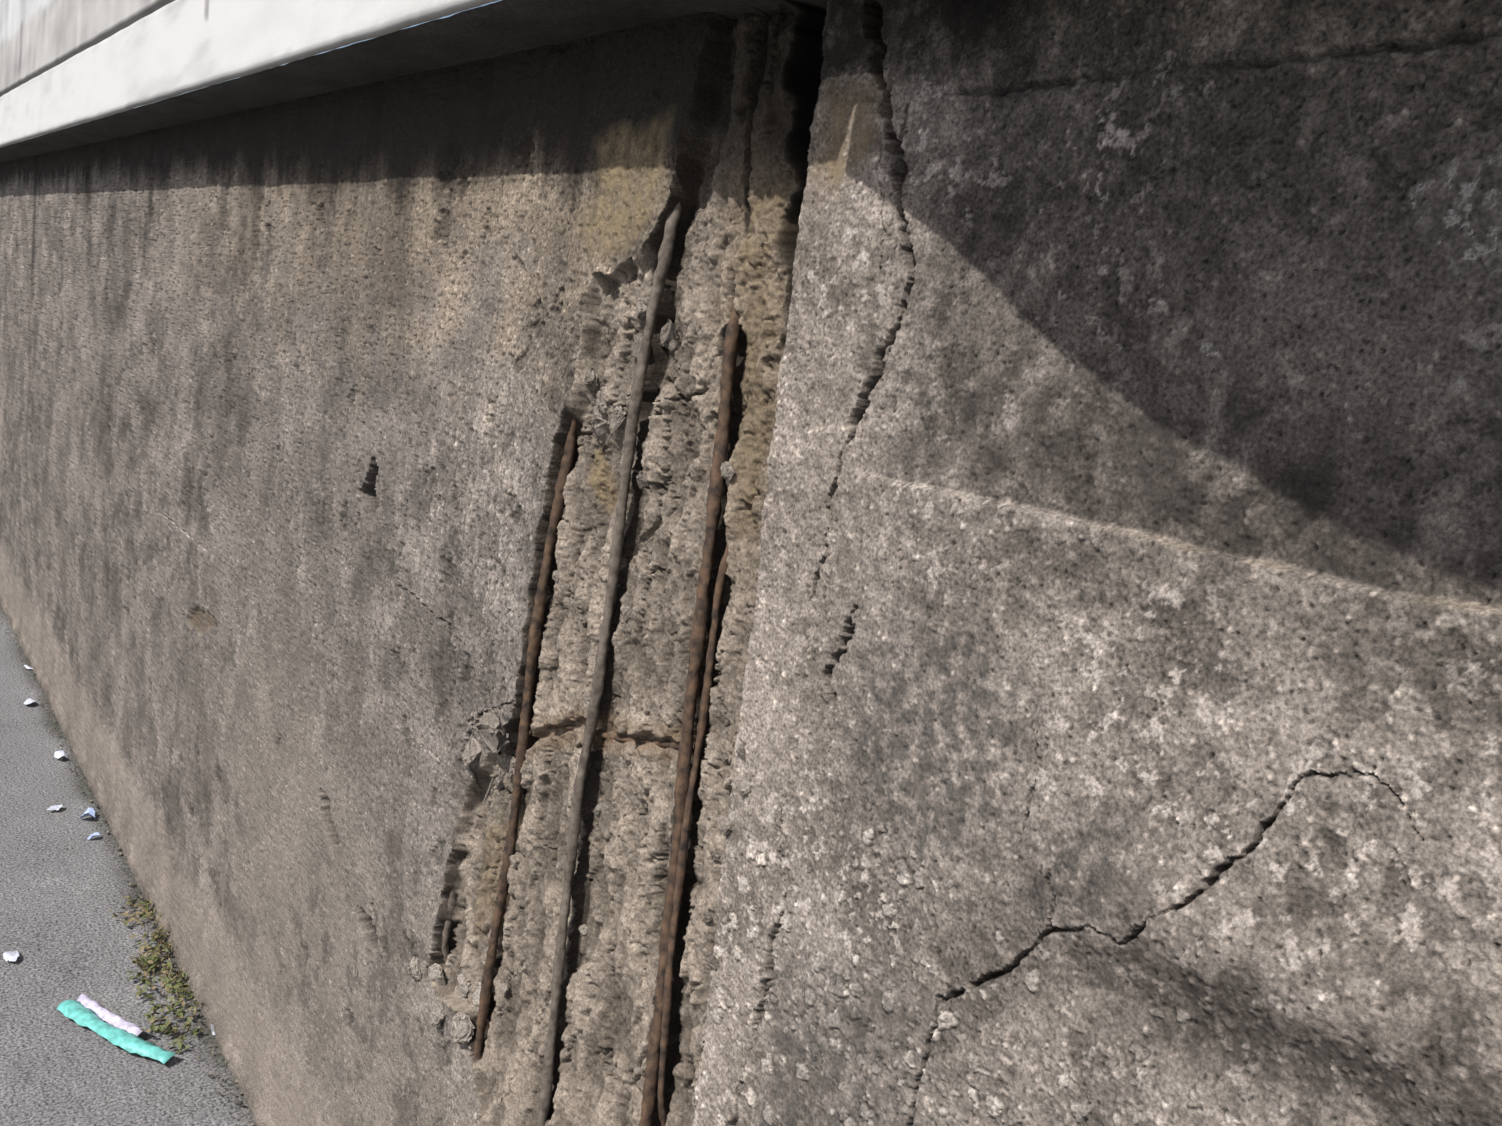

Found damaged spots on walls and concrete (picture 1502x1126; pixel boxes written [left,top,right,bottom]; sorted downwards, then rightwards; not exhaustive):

leakage [0,12,713,268]
corrosion [588,127,664,253]
crack [805,0,917,613]
spalling [407,0,828,1126]
crack [818,603,859,806]
crack [905,726,1425,1126]